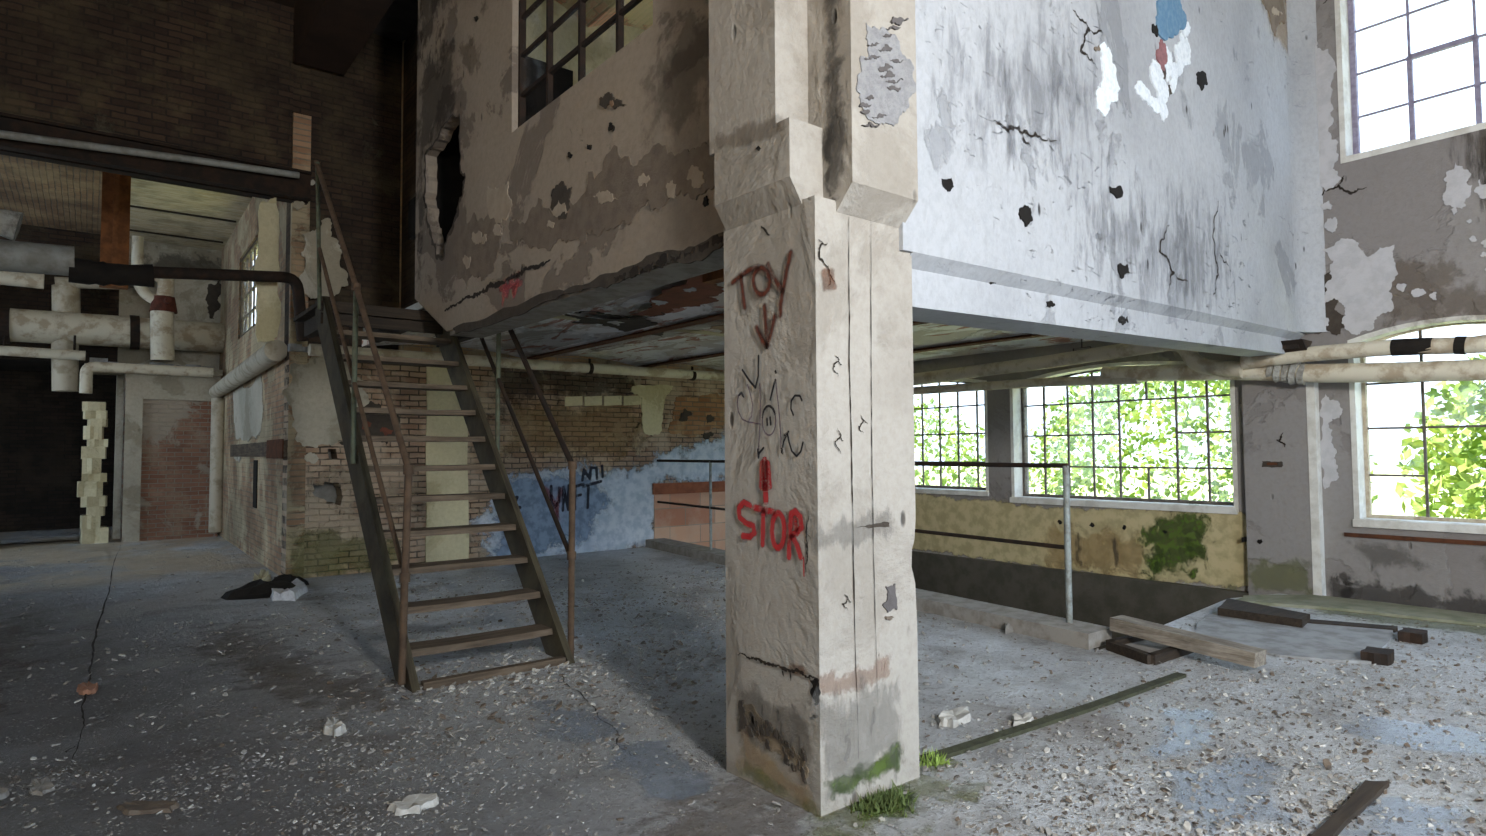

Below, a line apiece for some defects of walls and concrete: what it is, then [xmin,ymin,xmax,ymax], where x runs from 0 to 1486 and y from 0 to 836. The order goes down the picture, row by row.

peeling [423,114,715,290]
peeling [1315,39,1437,336]
peeling [1442,163,1486,271]
crack [444,259,551,312]
spalling [453,232,724,337]
crack [804,516,812,570]
crack [818,239,878,759]
water stain [1185,538,1198,579]
crack [65,545,121,762]
crack [738,653,818,683]